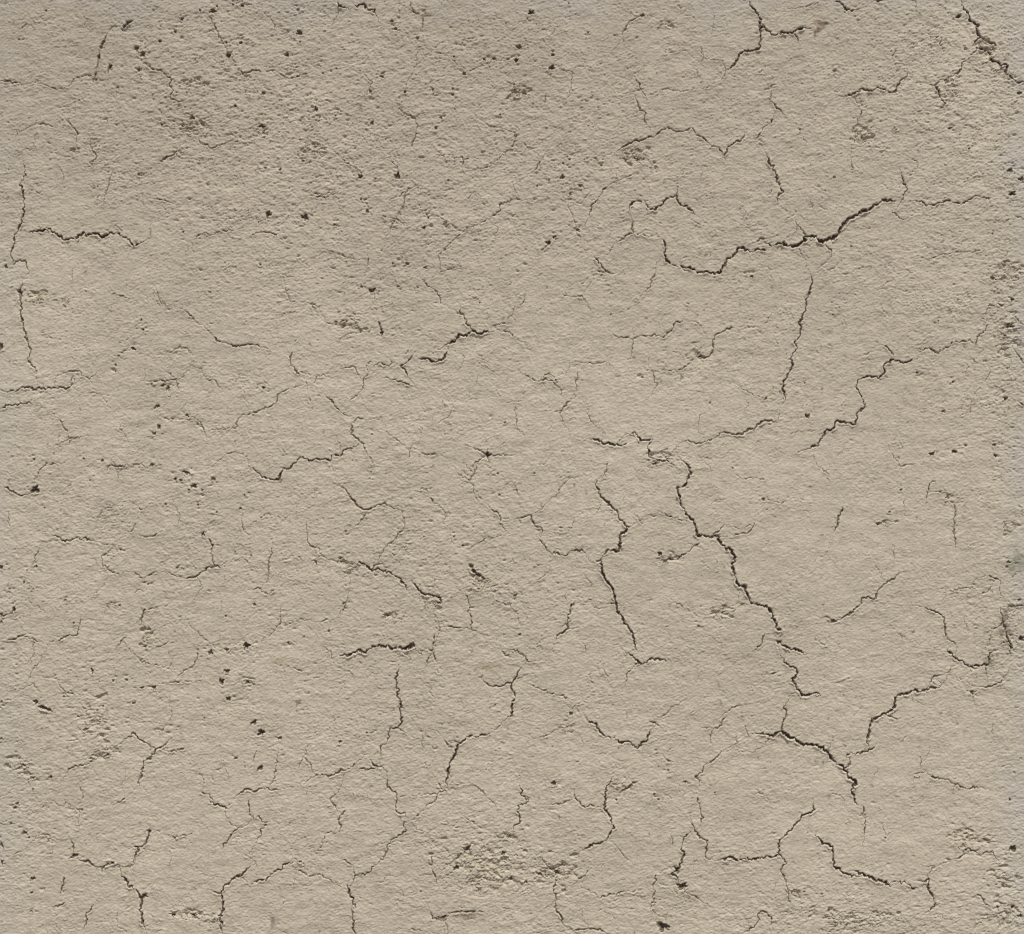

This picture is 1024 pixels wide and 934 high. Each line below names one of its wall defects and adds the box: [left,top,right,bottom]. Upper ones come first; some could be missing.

crack [0,74,100,90]
crack [0,114,287,526]
crack [208,16,308,96]
crack [137,48,544,481]
crack [333,2,440,45]
crack [561,1,858,312]
crack [838,0,1024,180]
crack [0,582,81,695]
crack [15,485,520,934]
crack [396,157,1024,934]